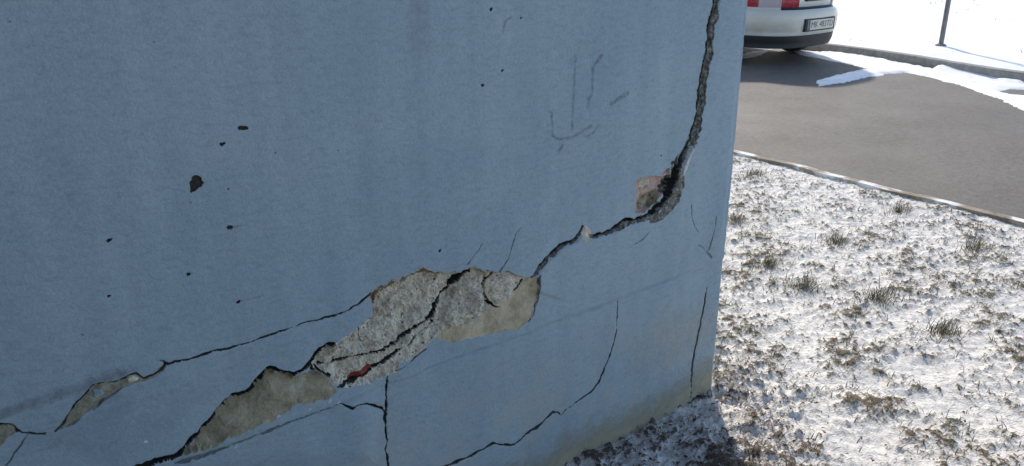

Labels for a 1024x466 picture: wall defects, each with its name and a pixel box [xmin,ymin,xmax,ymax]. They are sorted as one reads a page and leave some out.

crack [499,227,521,272]
crack [529,0,720,278]
spalling [634,168,670,214]
peeling [0,361,167,466]
crack [135,292,389,466]
spalling [308,266,541,388]
crack [444,300,618,466]
crack [690,288,707,397]